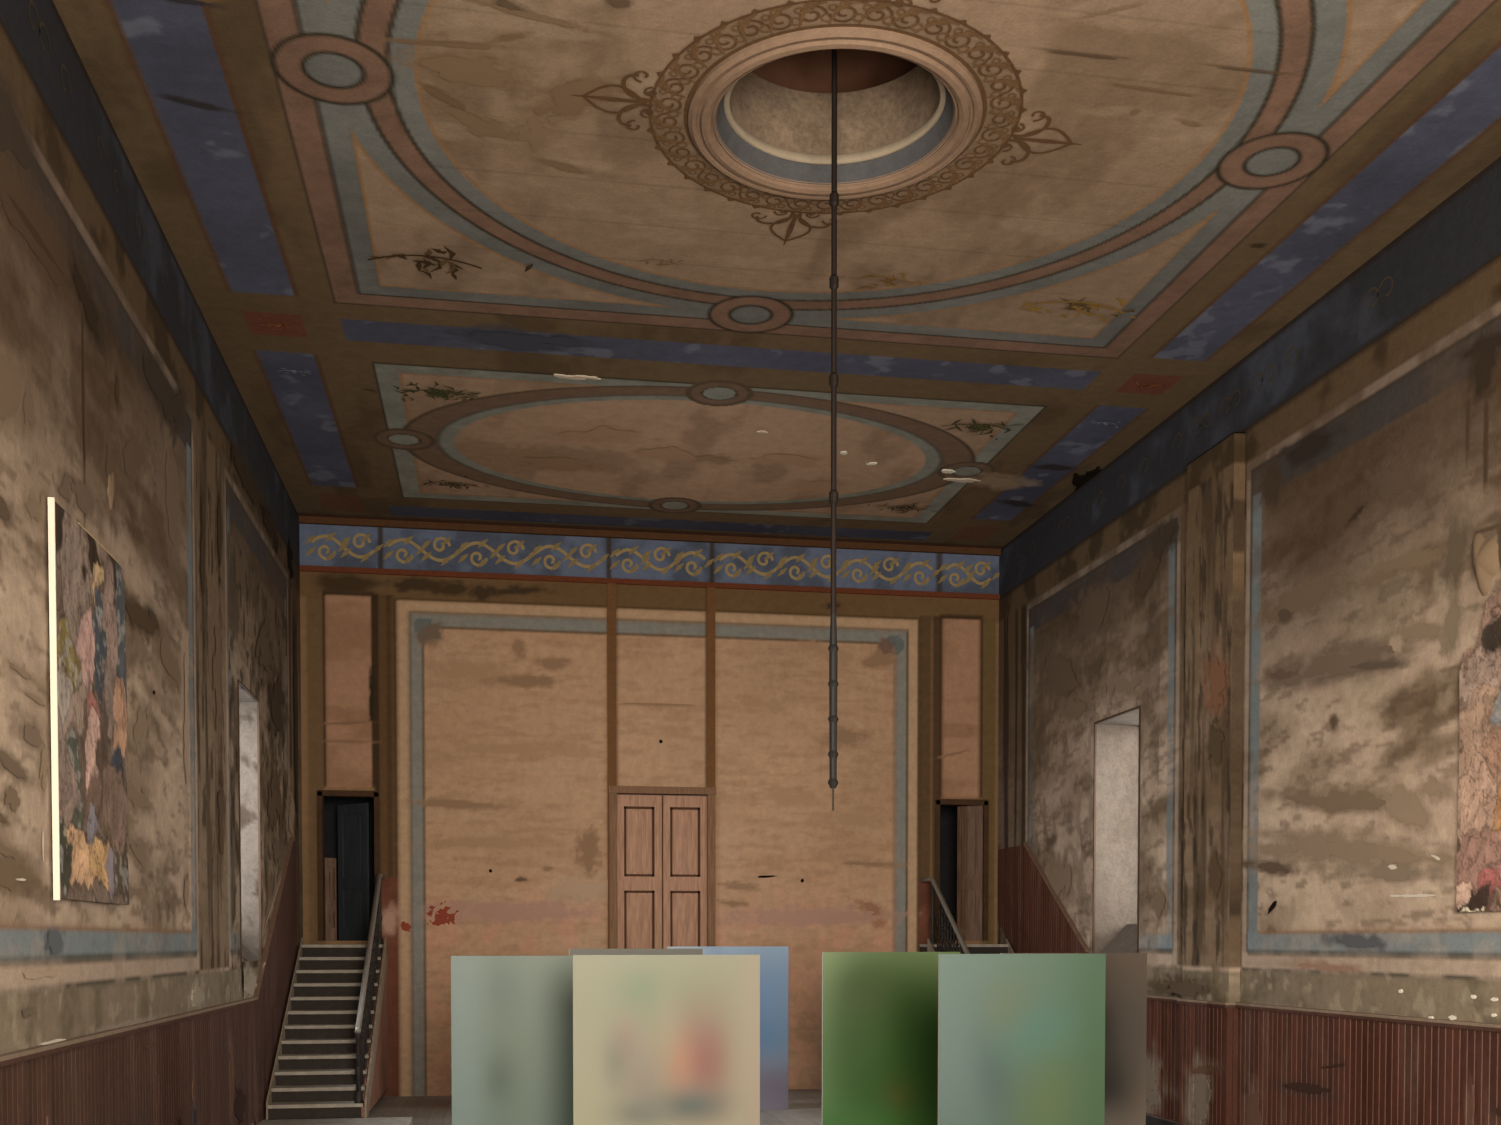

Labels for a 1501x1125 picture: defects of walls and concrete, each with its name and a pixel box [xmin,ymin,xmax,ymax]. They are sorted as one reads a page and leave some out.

damp [201,494,222,594]
peeling [1191,1073,1211,1120]